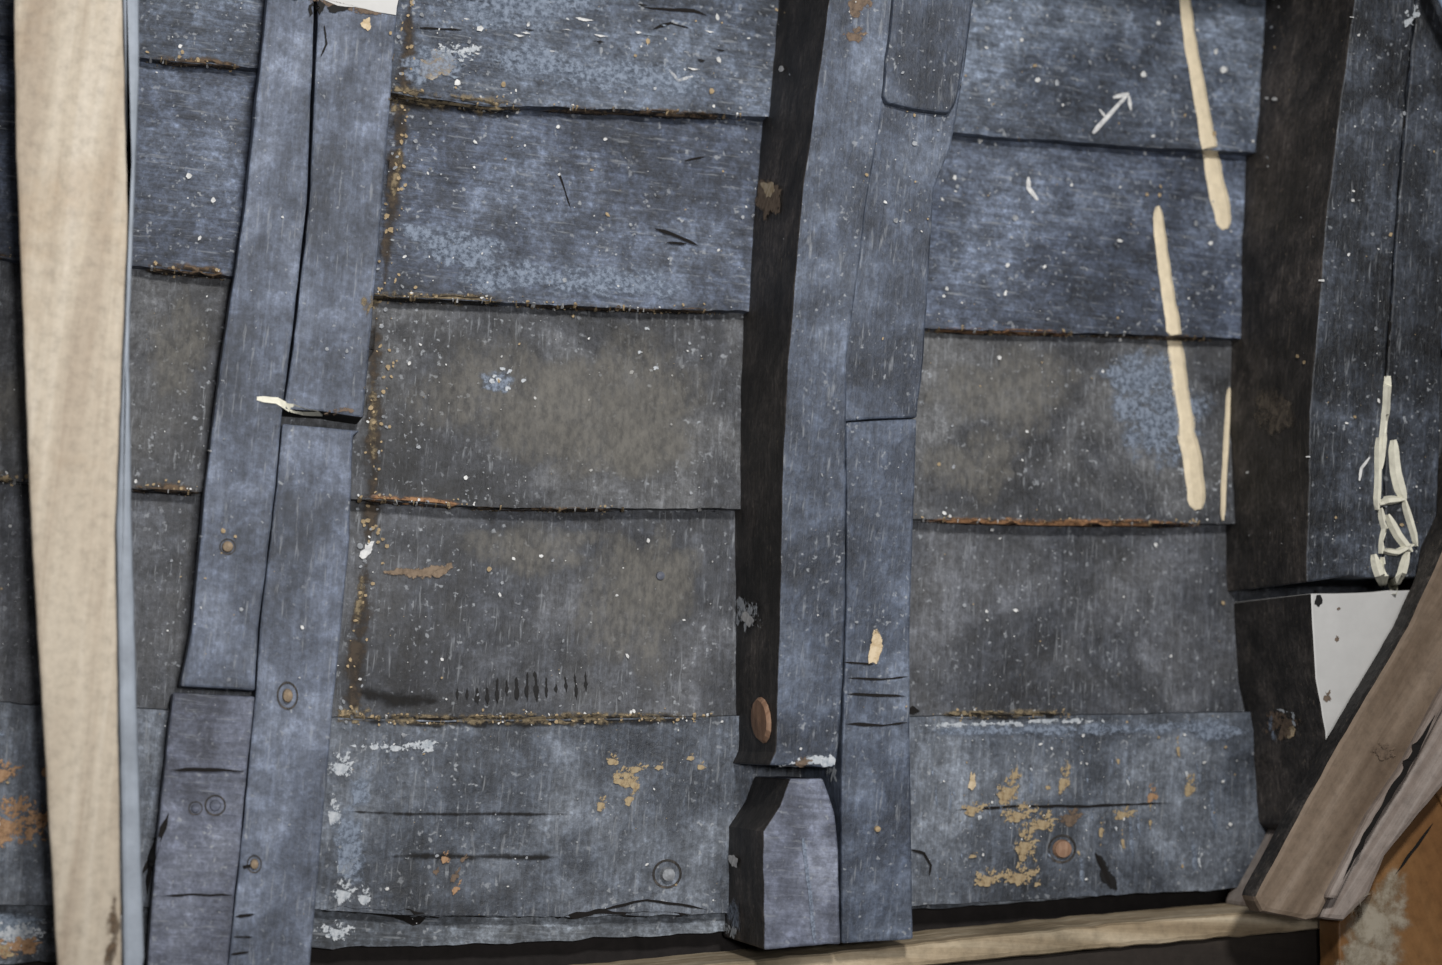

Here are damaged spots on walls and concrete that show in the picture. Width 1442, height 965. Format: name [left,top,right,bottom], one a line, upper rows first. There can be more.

rust [145,51,239,72]
rust [146,261,226,280]
rust [338,0,745,729]
rust [134,479,198,496]
rust [916,514,1208,528]